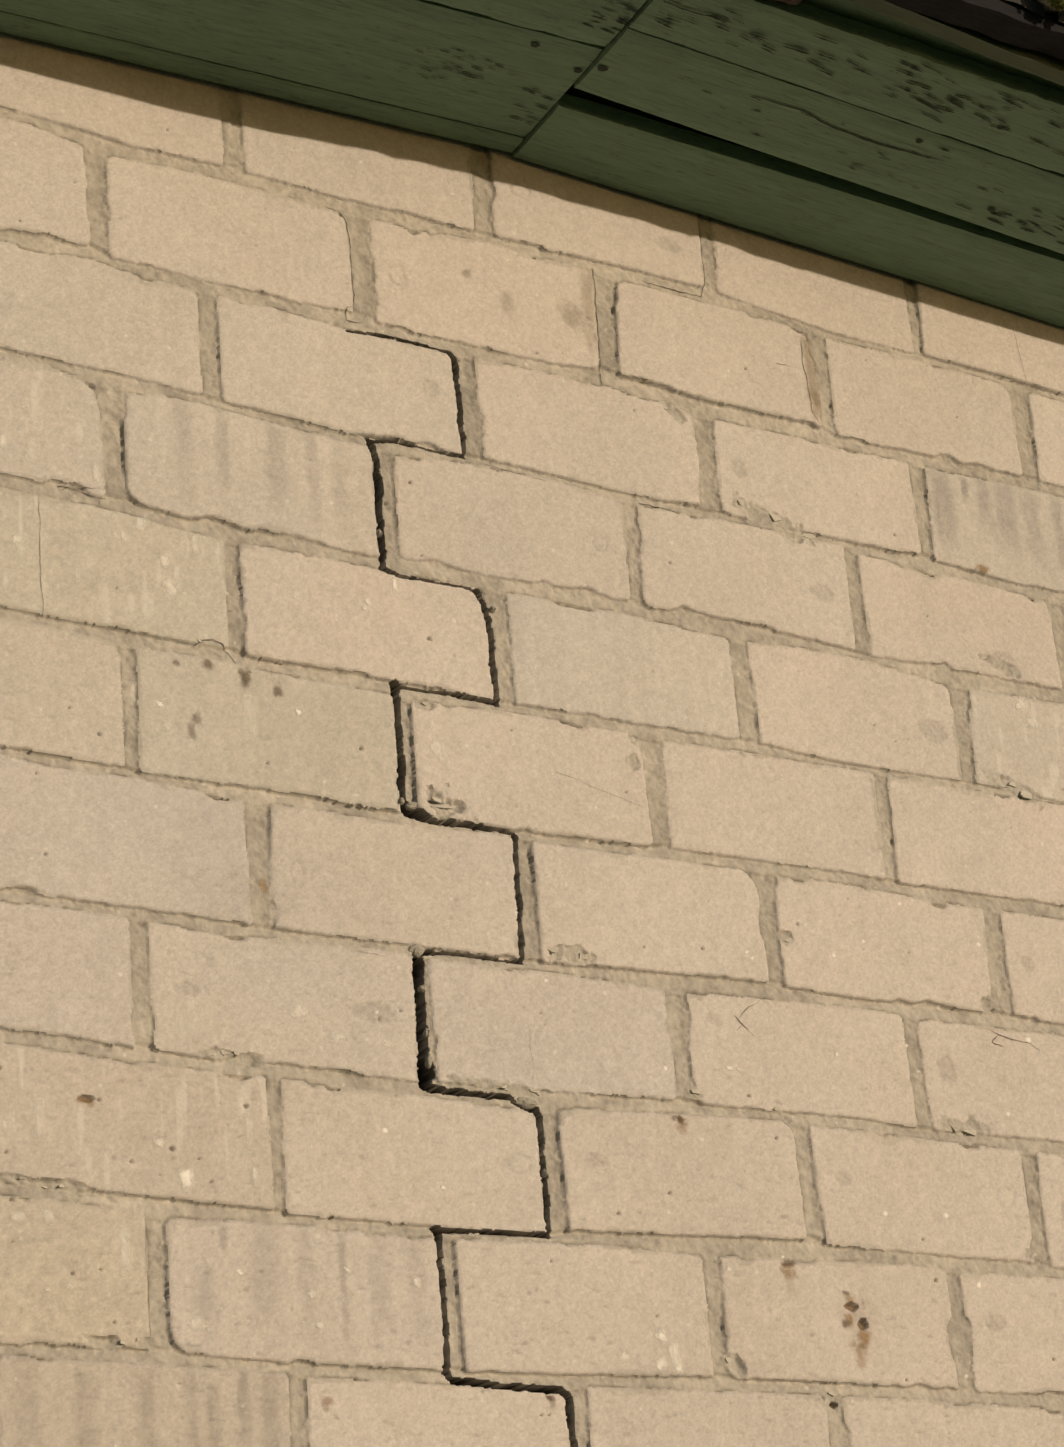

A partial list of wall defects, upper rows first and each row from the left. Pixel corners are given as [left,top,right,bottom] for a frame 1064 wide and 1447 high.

crack [327,207,578,1447]